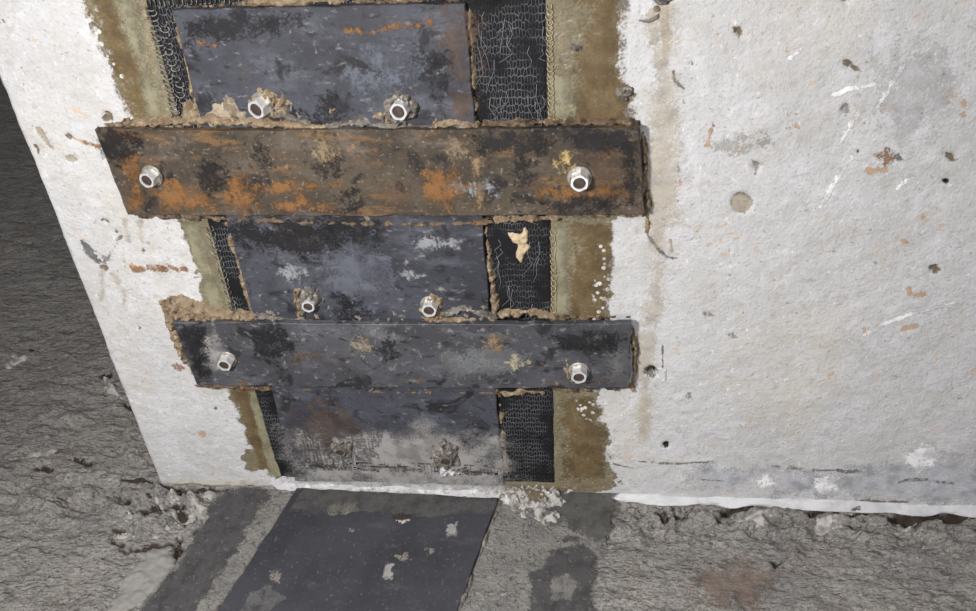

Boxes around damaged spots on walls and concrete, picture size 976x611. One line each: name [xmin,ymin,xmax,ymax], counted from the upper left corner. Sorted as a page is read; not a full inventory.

leakage [183,6,310,48]
leakage [84,0,182,169]
corrosion [122,155,216,218]
leakage [176,214,232,311]
corrosion [224,171,344,216]
leakage [228,187,384,263]
corrosion [420,167,468,210]
leakage [471,0,648,352]
corrosion [536,185,633,201]
leakage [171,322,213,379]
leakage [228,385,281,480]
leakage [503,388,622,611]